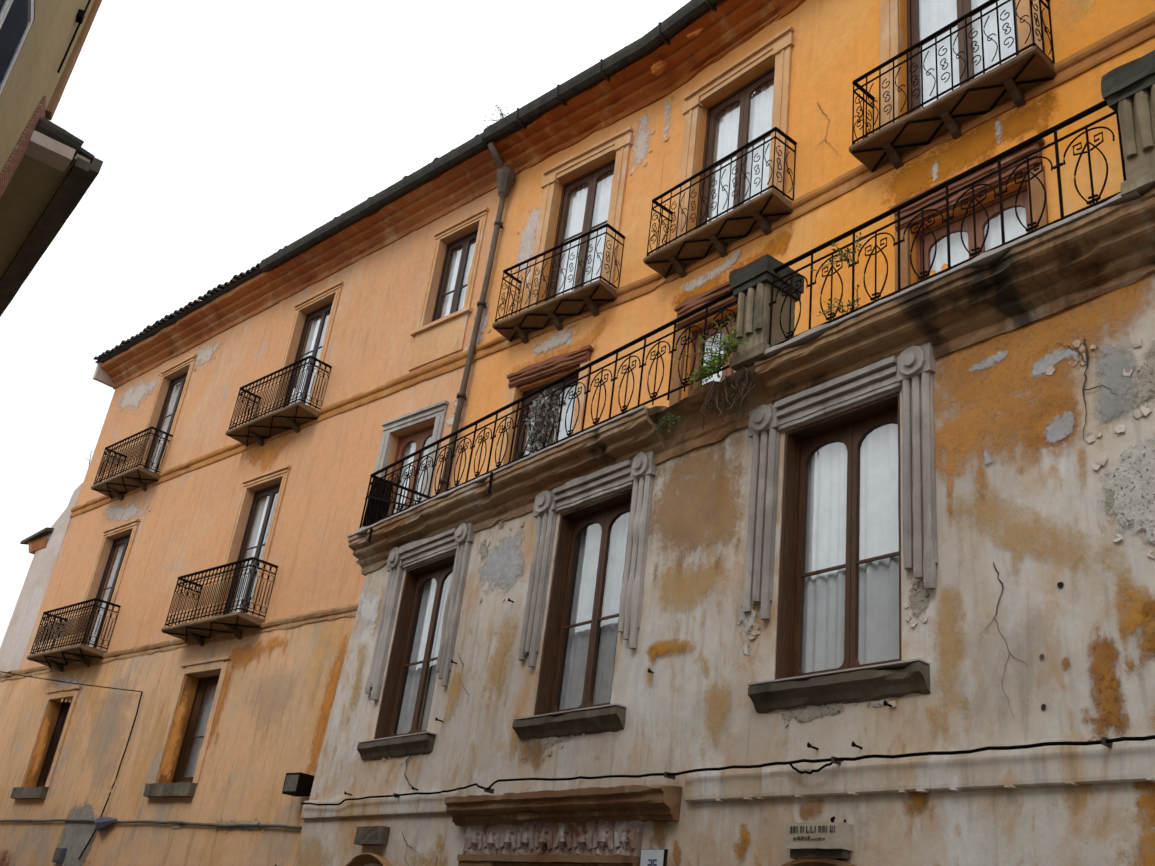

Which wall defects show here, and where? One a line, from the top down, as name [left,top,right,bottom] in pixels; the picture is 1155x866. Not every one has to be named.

peeling [629,95,674,176]
peeling [116,374,159,415]
peeling [194,342,222,371]
flaking render [968,350,1008,372]
damp [934,274,1155,566]
crack [1057,339,1116,440]
flaking render [1030,337,1155,443]
peeling [104,495,150,521]
flaking render [1092,434,1155,559]
flaking render [478,521,525,602]
crack [980,561,1026,717]